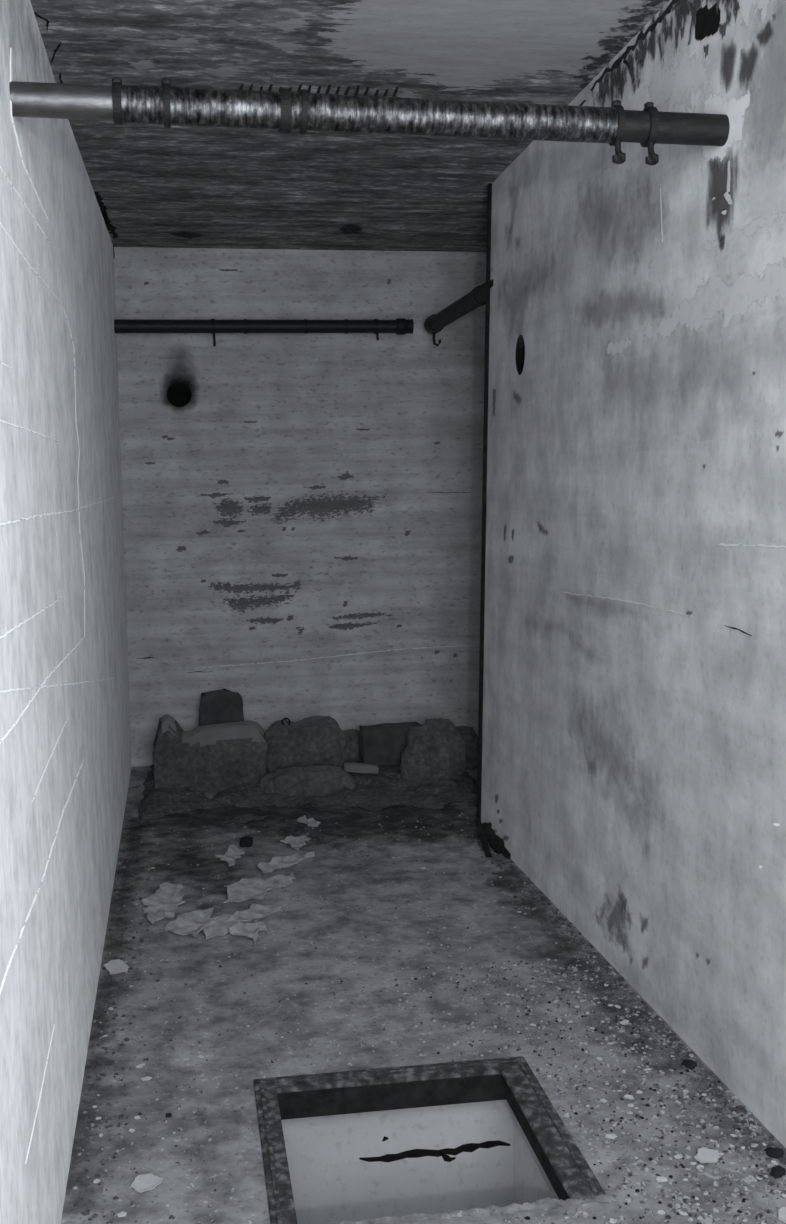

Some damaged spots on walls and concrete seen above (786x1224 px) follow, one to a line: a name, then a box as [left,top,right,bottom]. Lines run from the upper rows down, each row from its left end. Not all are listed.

water stain [598,893,647,967]